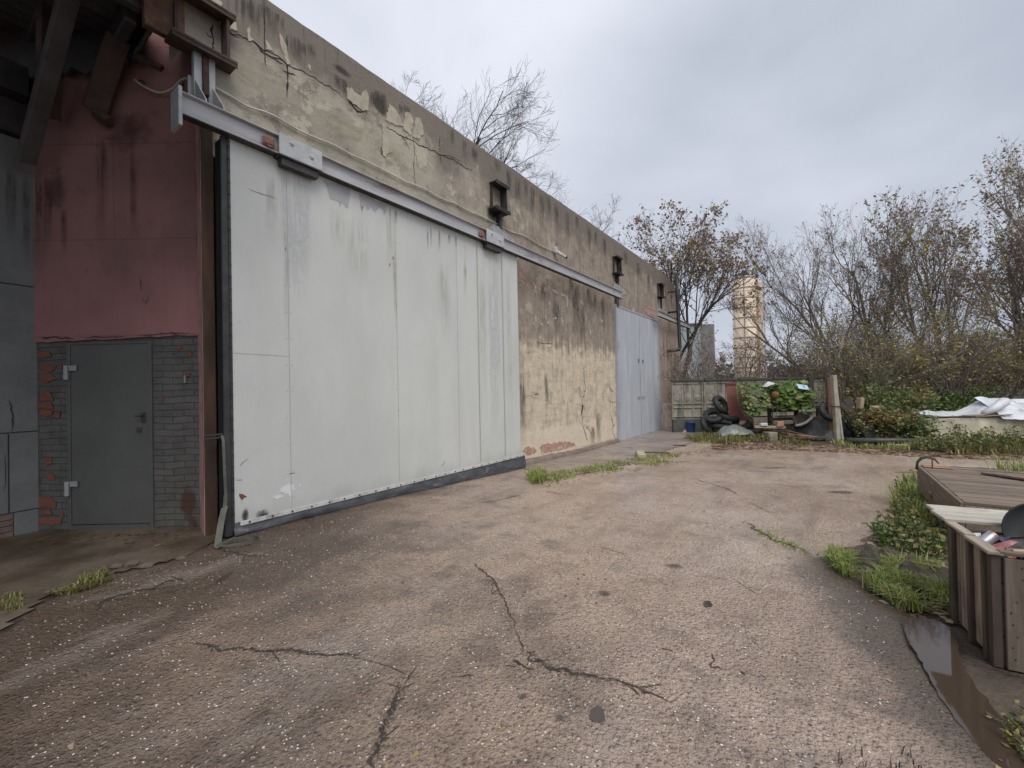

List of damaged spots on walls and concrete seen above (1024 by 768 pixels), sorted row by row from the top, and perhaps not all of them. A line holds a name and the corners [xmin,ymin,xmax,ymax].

crack [206,5,344,98]
flaking render [346,87,369,114]
flaking render [380,104,424,157]
crack [386,126,472,192]
crack [580,364,616,440]
flaking render [523,441,575,455]